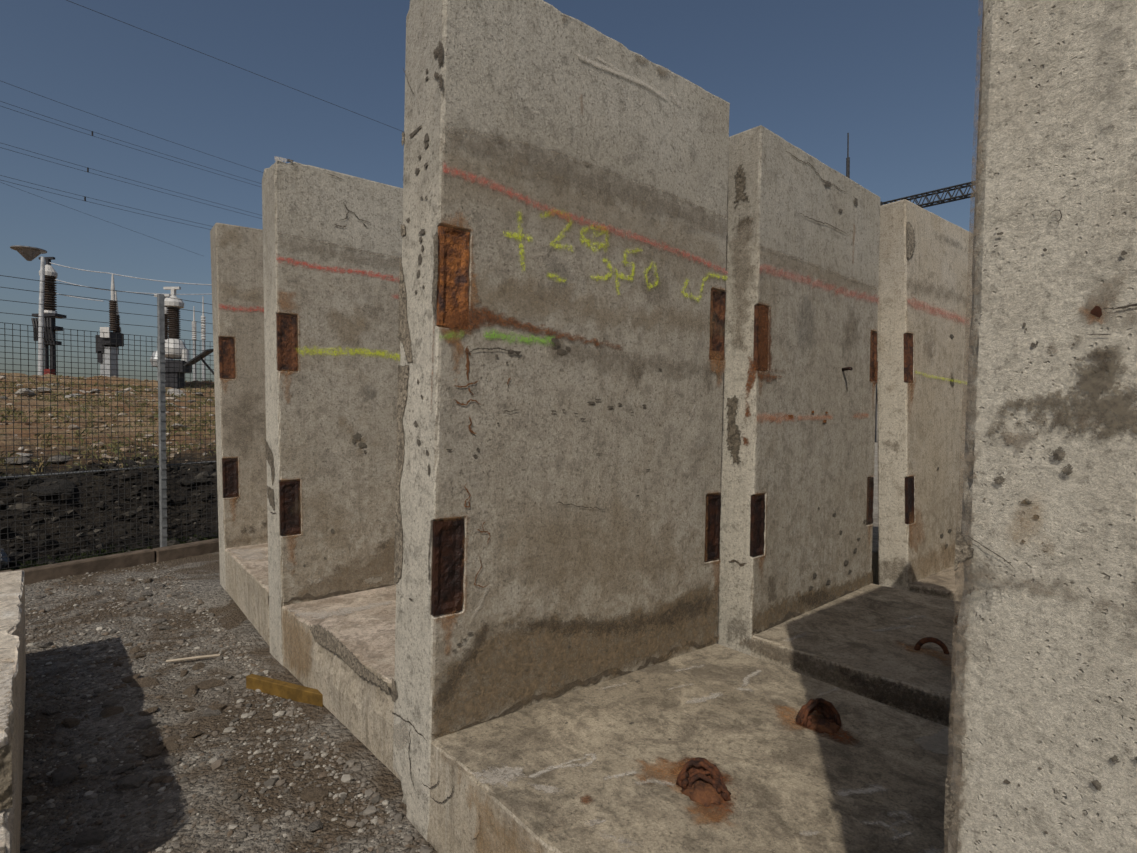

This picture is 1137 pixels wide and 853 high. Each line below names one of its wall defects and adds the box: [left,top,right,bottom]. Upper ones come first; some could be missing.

crack [327,173,370,227]
corrosion [432,274,621,359]
crack [392,637,717,789]
damp [432,585,719,739]
crack [753,589,858,633]
damp [739,561,990,728]